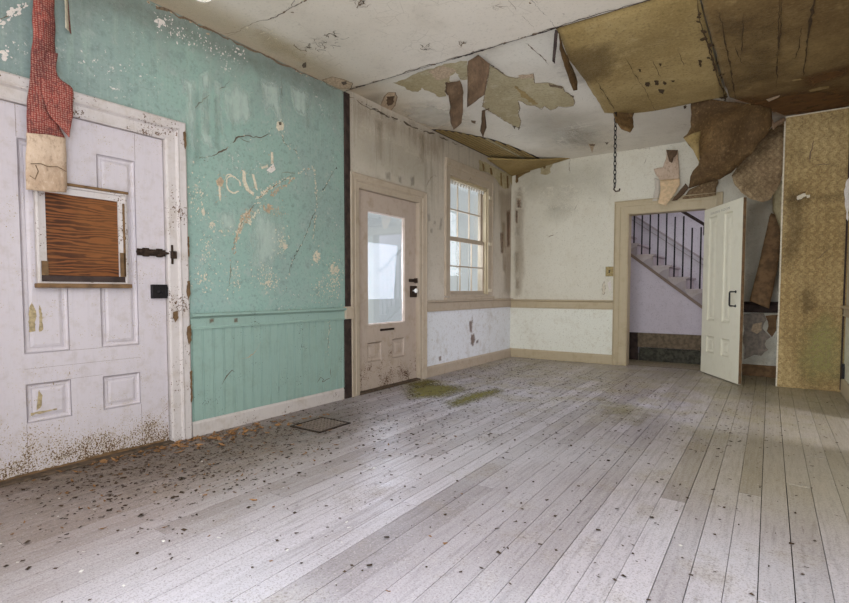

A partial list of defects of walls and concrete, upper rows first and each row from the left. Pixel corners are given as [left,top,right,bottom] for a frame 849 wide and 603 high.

crack [0,2,28,28]
crack [147,0,649,145]
peeling [381,61,468,110]
peeling [482,66,575,130]
peeling [186,161,231,299]
crack [200,128,337,295]
peeling [751,315,778,337]